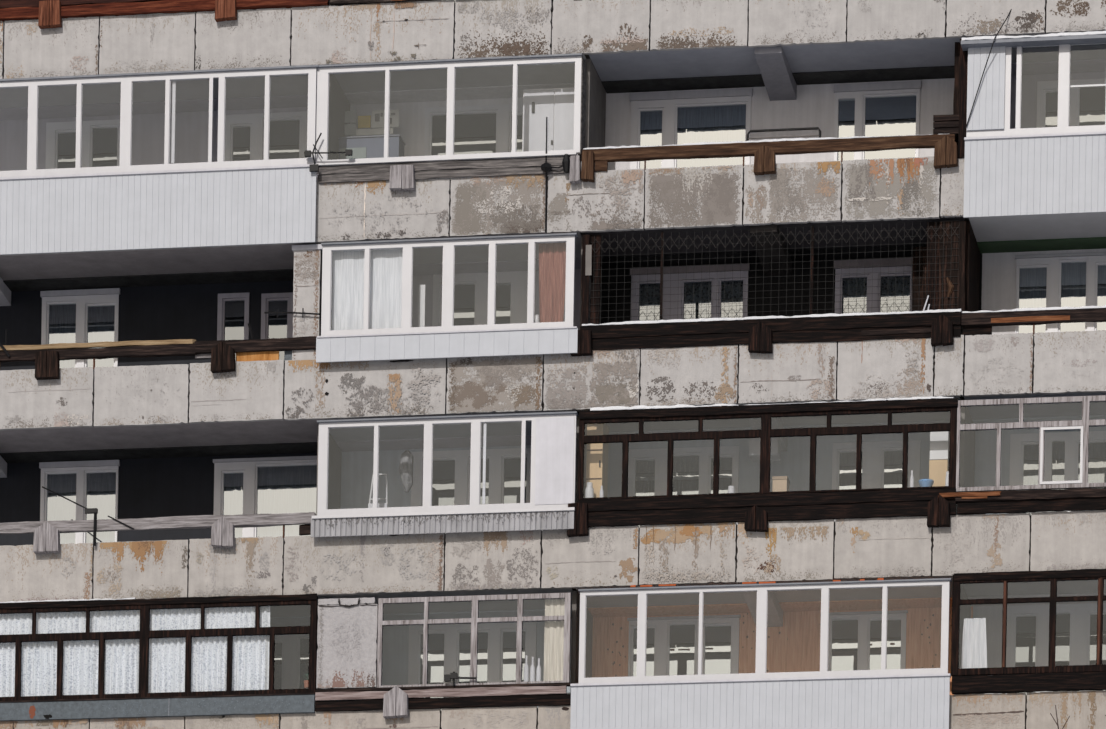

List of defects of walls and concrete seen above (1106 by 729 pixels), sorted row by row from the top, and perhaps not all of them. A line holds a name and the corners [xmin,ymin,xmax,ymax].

spalling [456,25,550,58]
spalling [950,0,1106,35]
rust [868,158,928,216]
rust [83,541,169,600]
rust [619,522,752,583]
rust [764,519,870,574]
rust [982,514,1006,569]